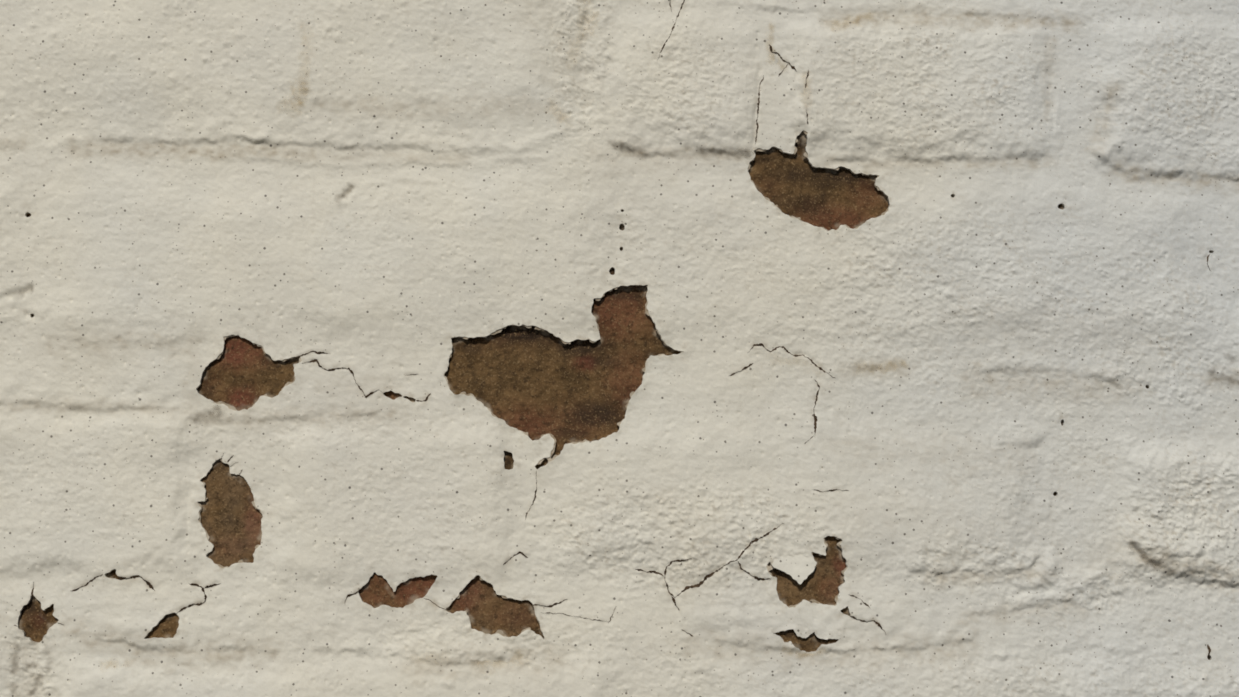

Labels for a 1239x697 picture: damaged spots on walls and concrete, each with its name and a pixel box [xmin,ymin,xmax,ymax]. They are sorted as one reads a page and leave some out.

crack [755,45,809,144]
peeling [748,130,890,231]
peeling [196,335,302,411]
crack [295,351,377,398]
peeling [444,285,684,470]
crack [729,343,835,443]
peeling [198,458,263,568]
crack [72,574,155,591]
crack [177,583,221,613]
peeling [446,575,544,638]
crack [635,523,784,636]
peeling [767,536,851,616]